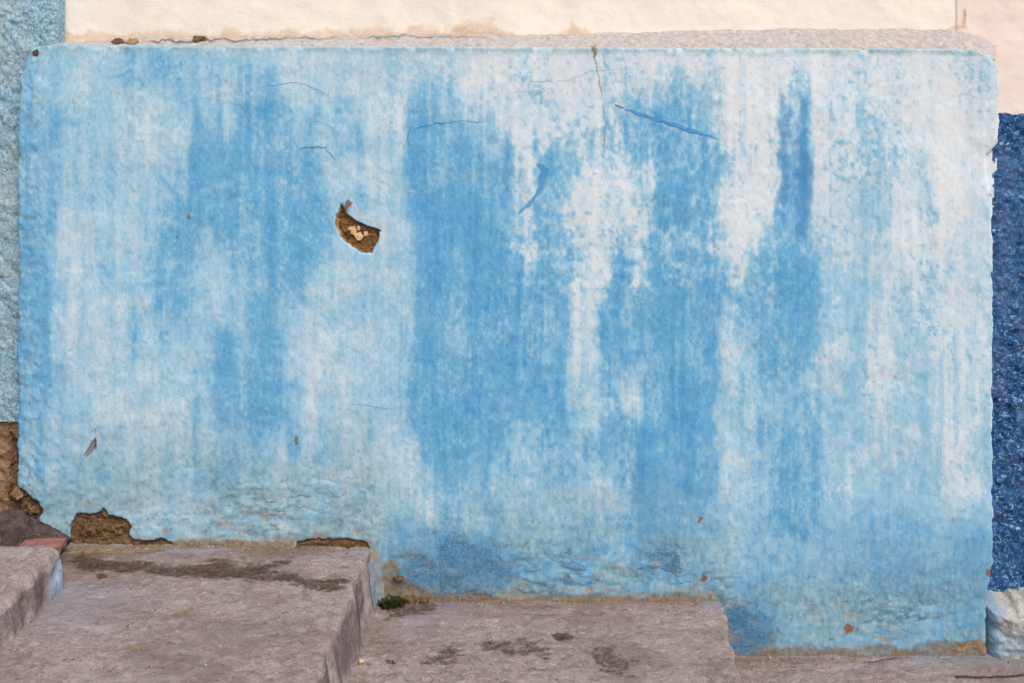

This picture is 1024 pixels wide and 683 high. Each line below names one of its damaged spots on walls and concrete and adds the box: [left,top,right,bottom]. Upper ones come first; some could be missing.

spalling [335,205,380,253]
spalling [7,426,43,520]
spalling [69,508,173,546]
peeling [246,471,375,549]